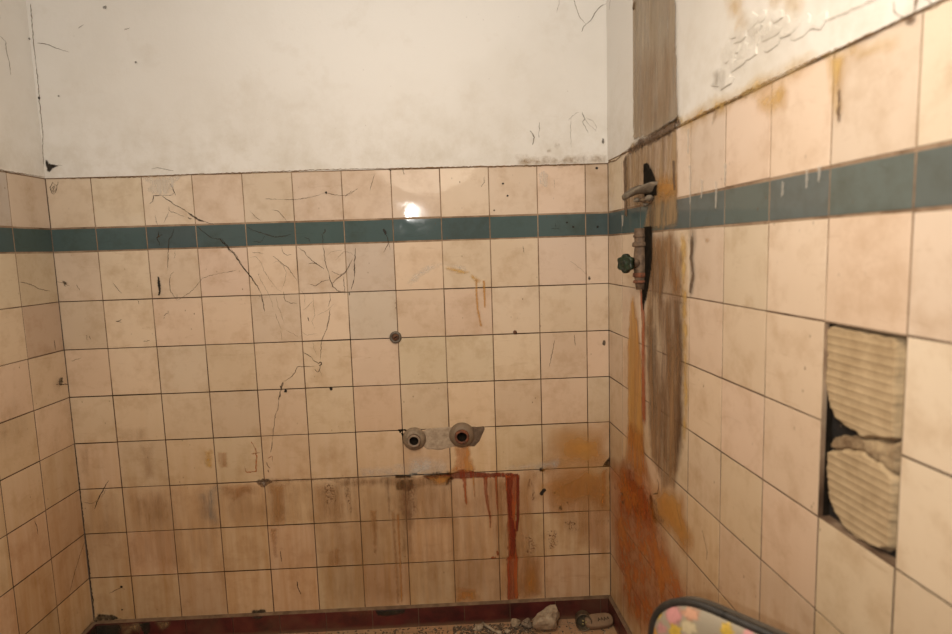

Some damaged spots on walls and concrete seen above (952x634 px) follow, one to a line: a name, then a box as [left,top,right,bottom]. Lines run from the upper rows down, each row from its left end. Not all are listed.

crack [1,0,949,179]
flaking render [632,0,677,139]
peeling [823,323,907,558]
damp [376,484,416,616]
corrosion [425,447,532,600]
corrosion [614,469,688,623]